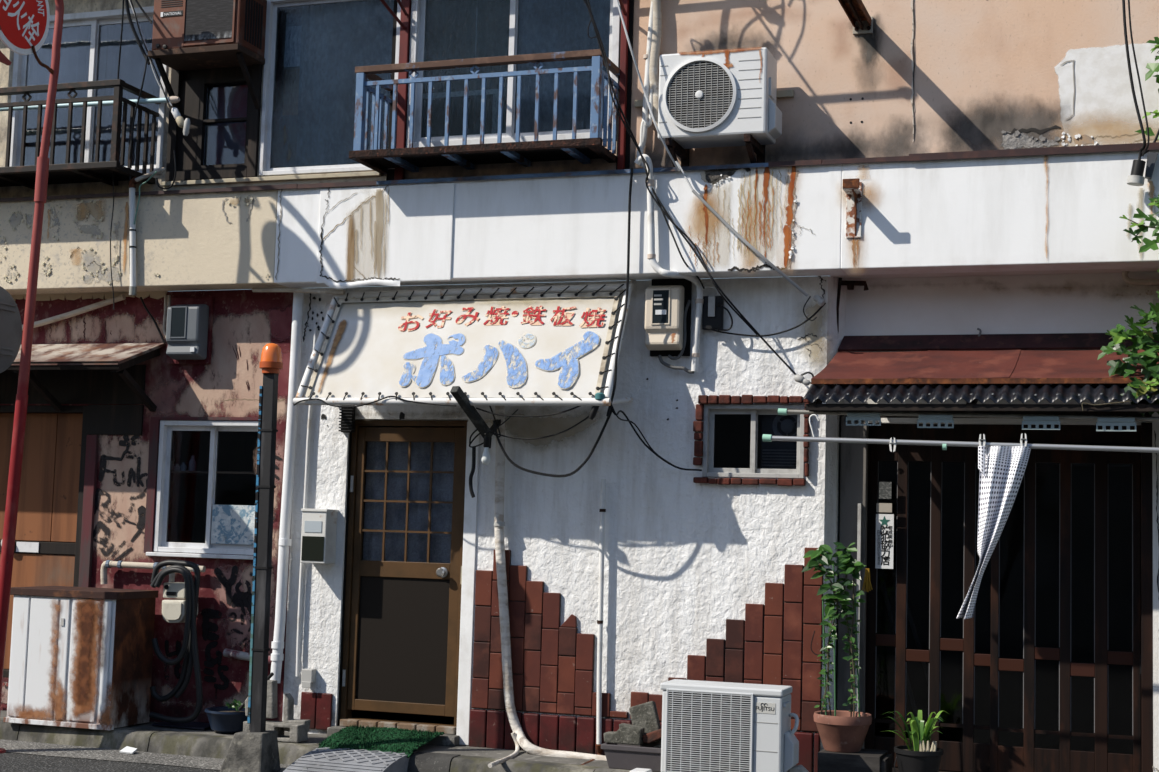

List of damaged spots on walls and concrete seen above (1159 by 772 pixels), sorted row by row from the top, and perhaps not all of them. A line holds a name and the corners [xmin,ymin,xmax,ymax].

leakage [857,18,879,64]
leakage [948,105,1159,151]
crack [275,189,283,280]
crack [303,185,399,342]
rust [689,184,720,267]
rust [737,166,796,268]
peeling [47,314,165,343]
peeling [145,304,293,418]
peeling [93,435,149,561]
peeling [274,444,284,508]
peeling [217,565,253,648]
peeling [268,530,280,656]